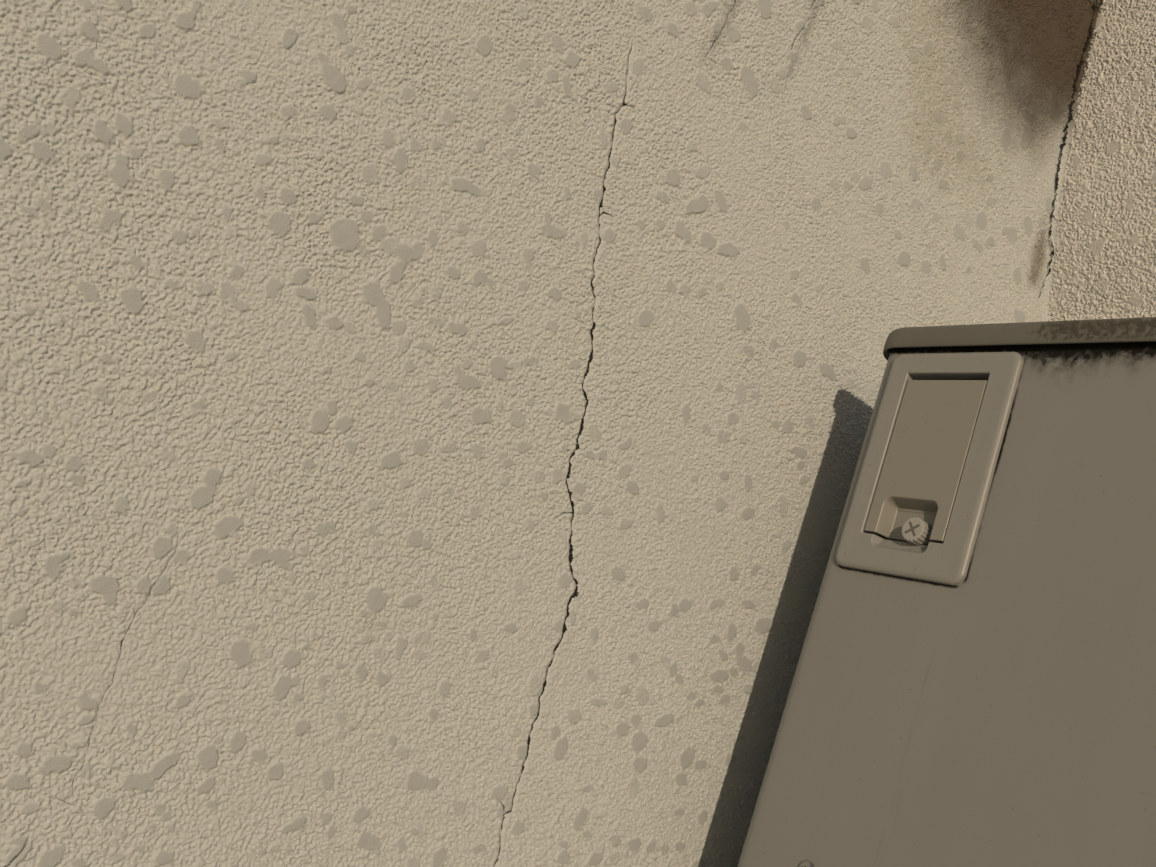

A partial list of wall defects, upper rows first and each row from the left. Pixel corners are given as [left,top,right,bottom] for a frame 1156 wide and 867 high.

crack [494,47,634,866]
damp [971,0,1103,125]